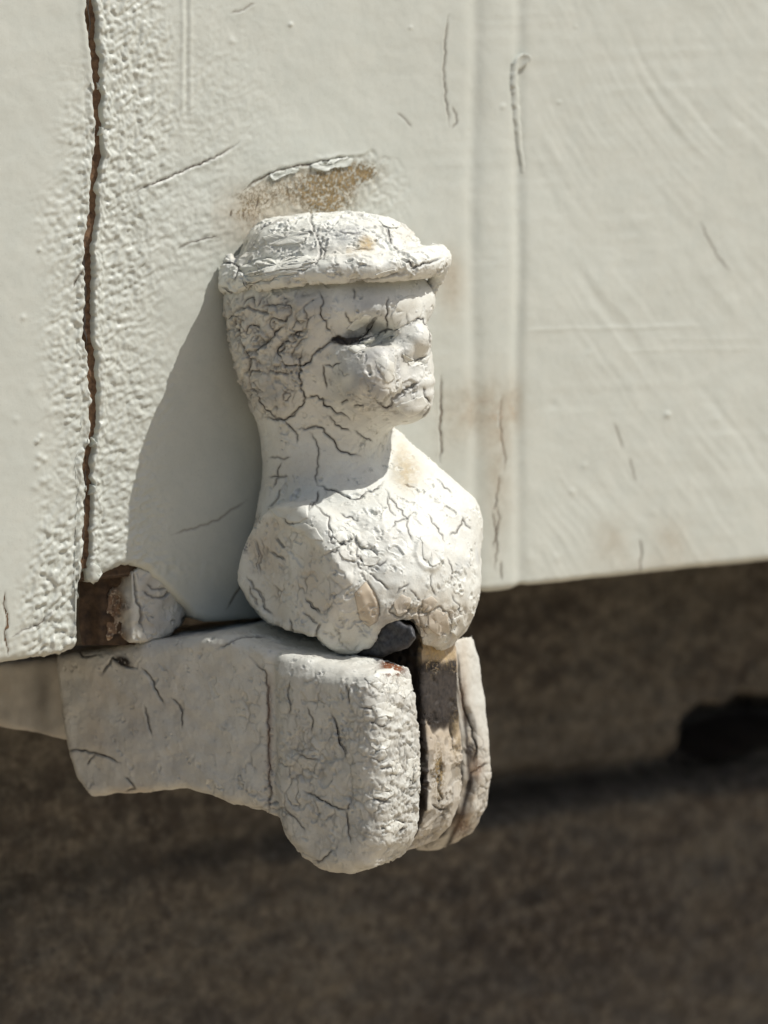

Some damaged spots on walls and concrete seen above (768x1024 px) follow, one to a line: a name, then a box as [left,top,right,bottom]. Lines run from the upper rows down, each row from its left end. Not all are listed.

crack [139,143,238,190]
peeling [269,157,353,181]
crack [74,0,104,568]
crack [221,257,506,632]
spalling [78,563,136,666]
crack [260,668,346,831]